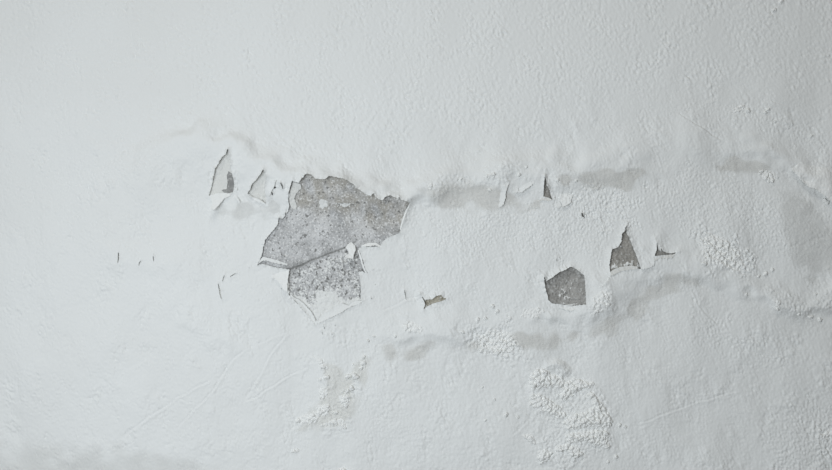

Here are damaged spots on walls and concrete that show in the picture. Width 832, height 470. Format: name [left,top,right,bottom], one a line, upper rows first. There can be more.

peeling [204,144,417,332]
peeling [413,287,455,318]
peeling [520,218,684,319]